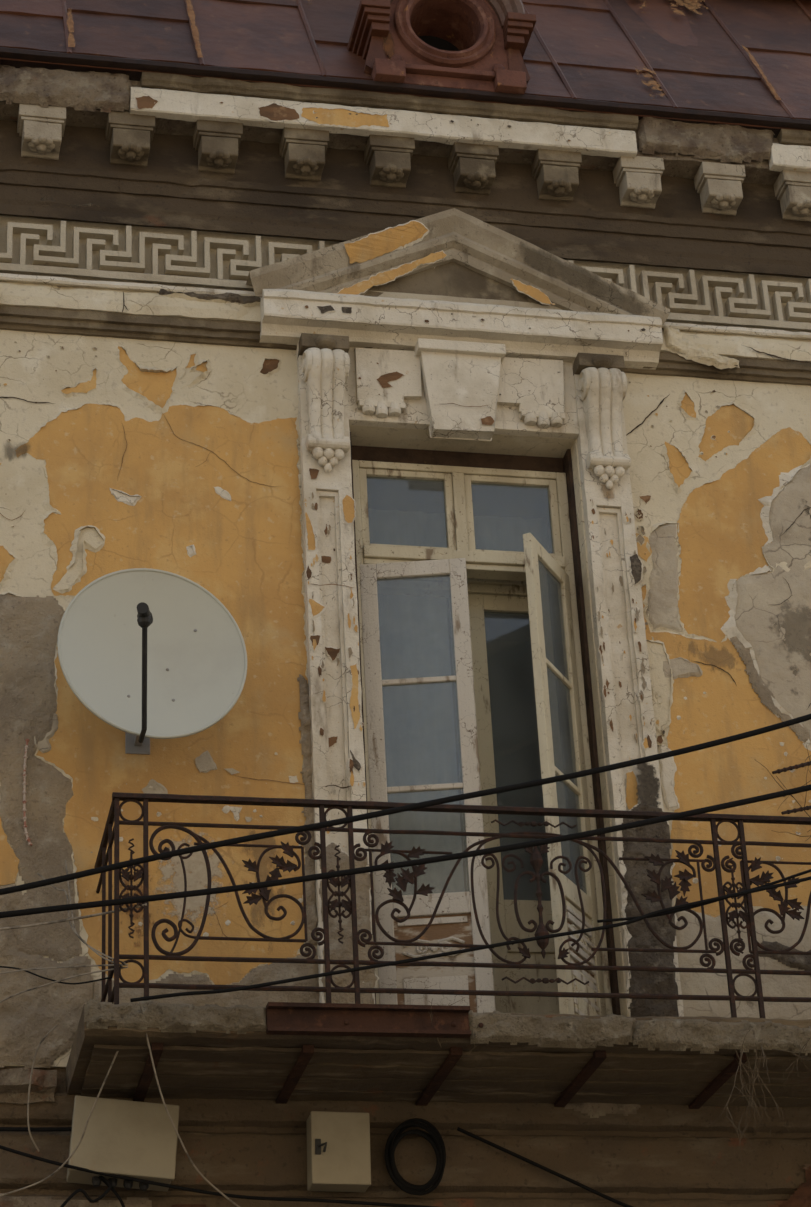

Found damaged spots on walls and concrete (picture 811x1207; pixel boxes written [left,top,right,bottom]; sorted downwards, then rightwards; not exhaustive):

rust [671,0,708,16]
rust [66,10,75,47]
rust [186,0,203,57]
peeling [135,95,159,109]
peeling [258,103,391,129]
rust [636,67,665,100]
rust [741,44,782,100]
peeling [304,220,447,315]
crack [0,396,56,404]
crack [163,414,277,487]
peeling [0,345,379,1068]